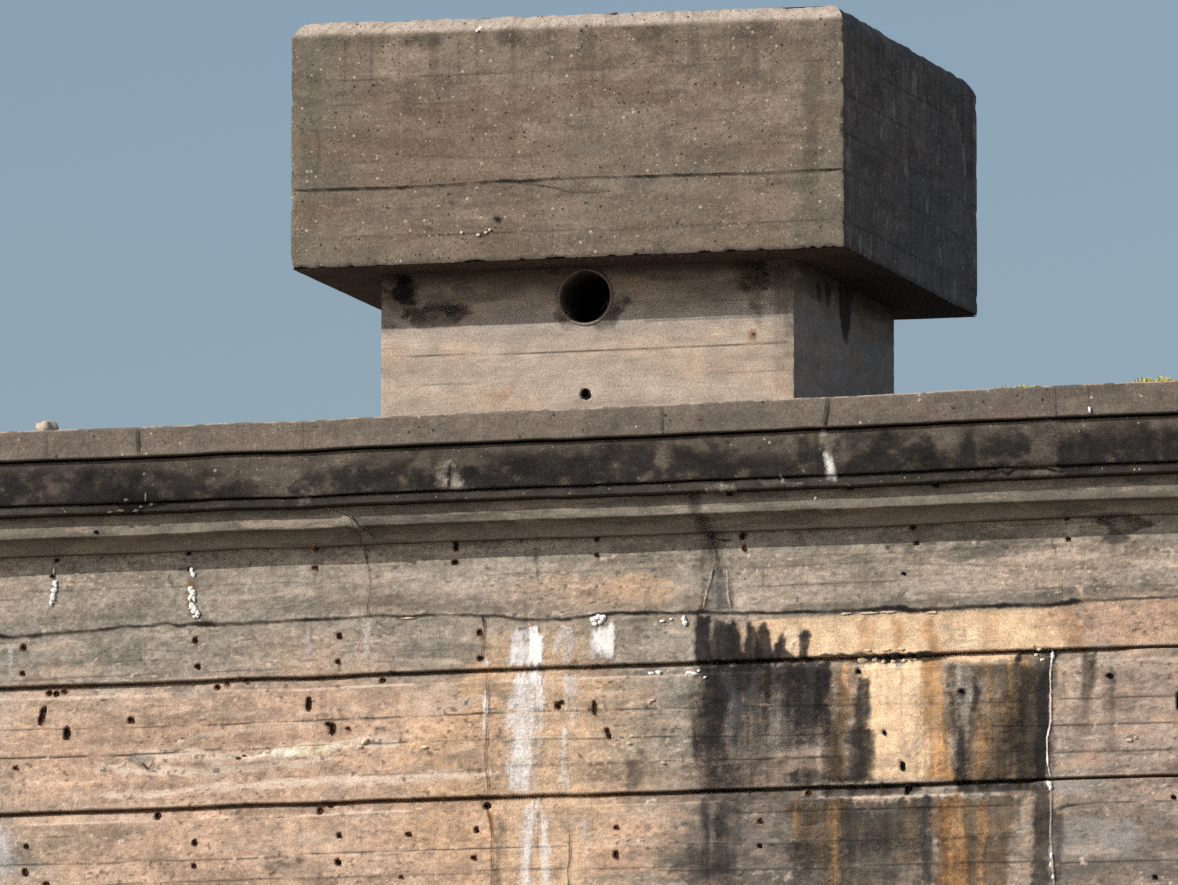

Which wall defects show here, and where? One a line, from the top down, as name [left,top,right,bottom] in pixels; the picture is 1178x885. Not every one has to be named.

leakage [384,274,471,323]
leakage [0,470,257,509]
leakage [287,428,1037,497]
leakage [1056,424,1178,467]
efflorescence [589,614,615,658]
efflorescence [508,626,572,786]
crack [0,509,1177,885]
leakage [671,567,935,885]
leakage [949,653,1062,885]
efflorescence [523,802,549,885]